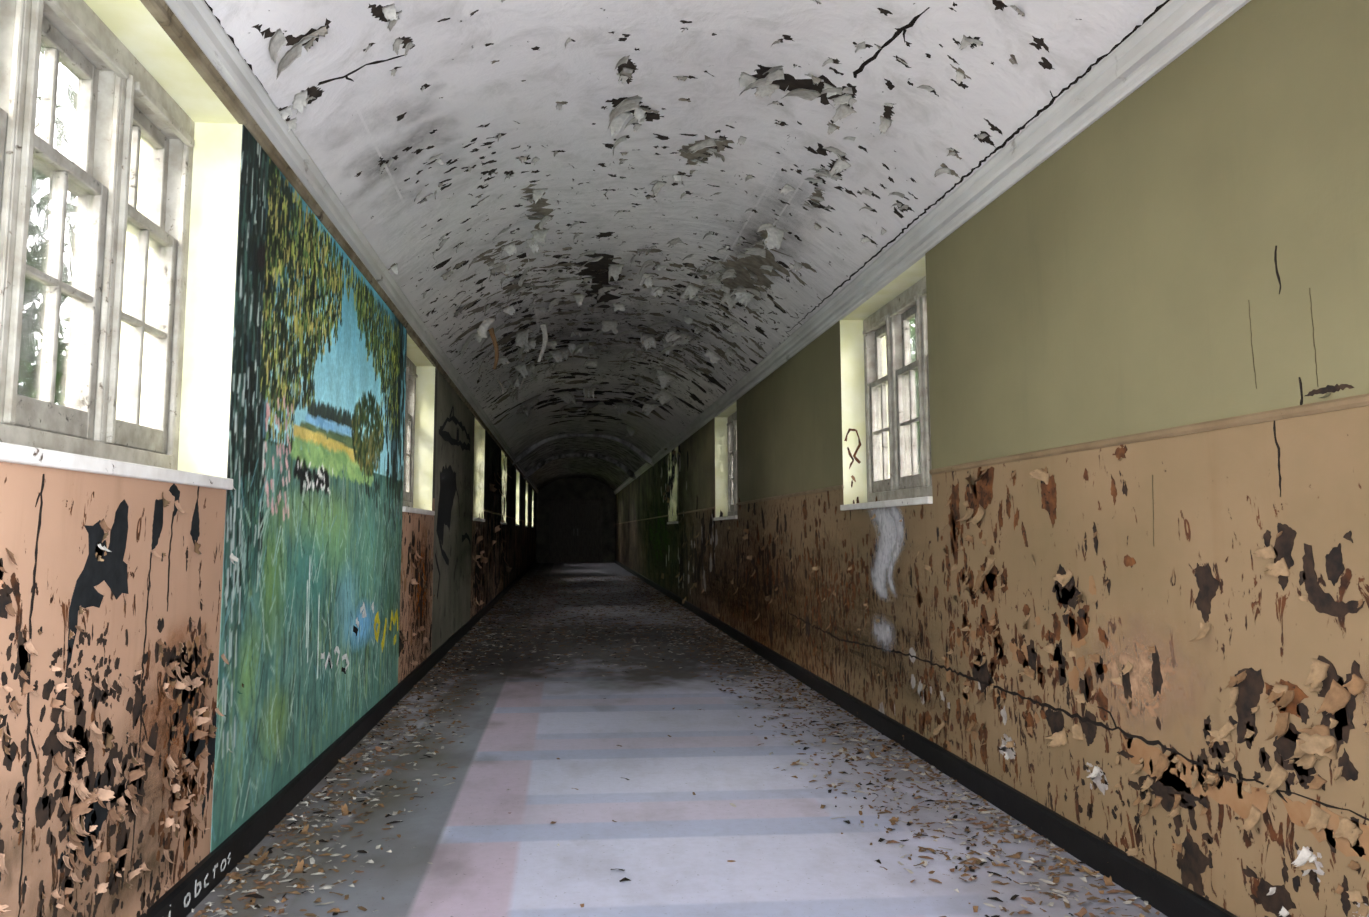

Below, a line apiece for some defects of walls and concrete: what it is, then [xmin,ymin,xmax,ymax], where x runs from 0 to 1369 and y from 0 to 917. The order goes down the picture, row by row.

peeling [253,18,331,80]
peeling [279,86,324,133]
peeling [368,3,415,77]
peeling [853,8,939,134]
peeling [926,35,983,89]
peeling [973,119,1002,147]
peeling [1029,36,1054,70]
peeling [378,31,918,438]
peeling [151,483,202,571]
damp [872,507,903,597]
peeling [0,499,232,917]
peeling [653,428,1369,917]